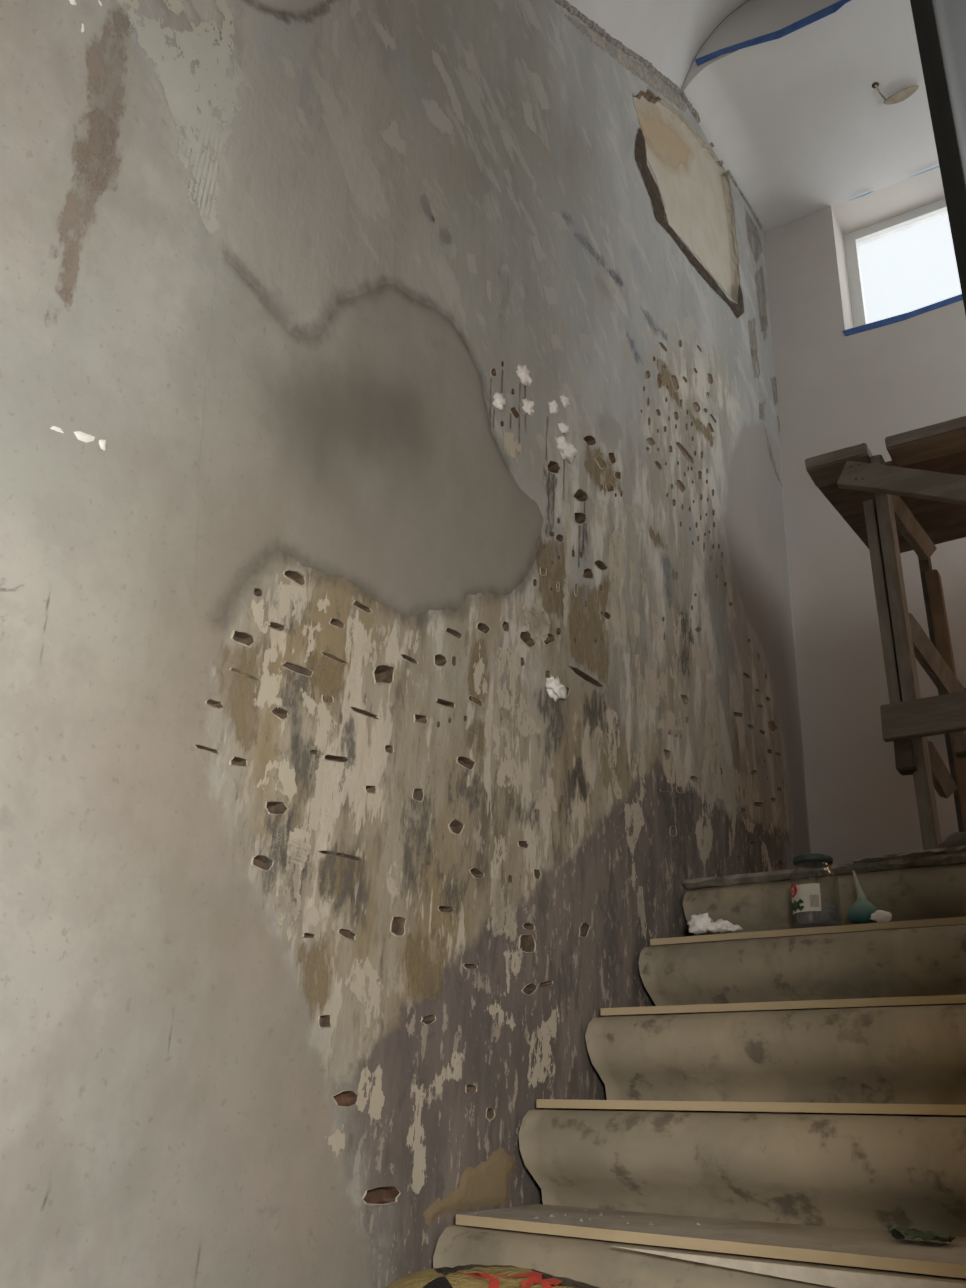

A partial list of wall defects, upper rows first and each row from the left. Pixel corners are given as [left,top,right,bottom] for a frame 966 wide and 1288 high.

flaking render [554,0,782,485]
leakage [195,258,565,622]
peeling [230,569,363,941]
leakage [282,670,319,785]
leakage [341,719,355,762]
leakage [538,693,563,755]
leakage [560,759,589,825]
peeling [473,461,966,940]
leakage [264,811,363,909]
peeling [331,1064,385,1121]
peeling [362,1048,477,1206]
peeling [527,1005,560,1088]